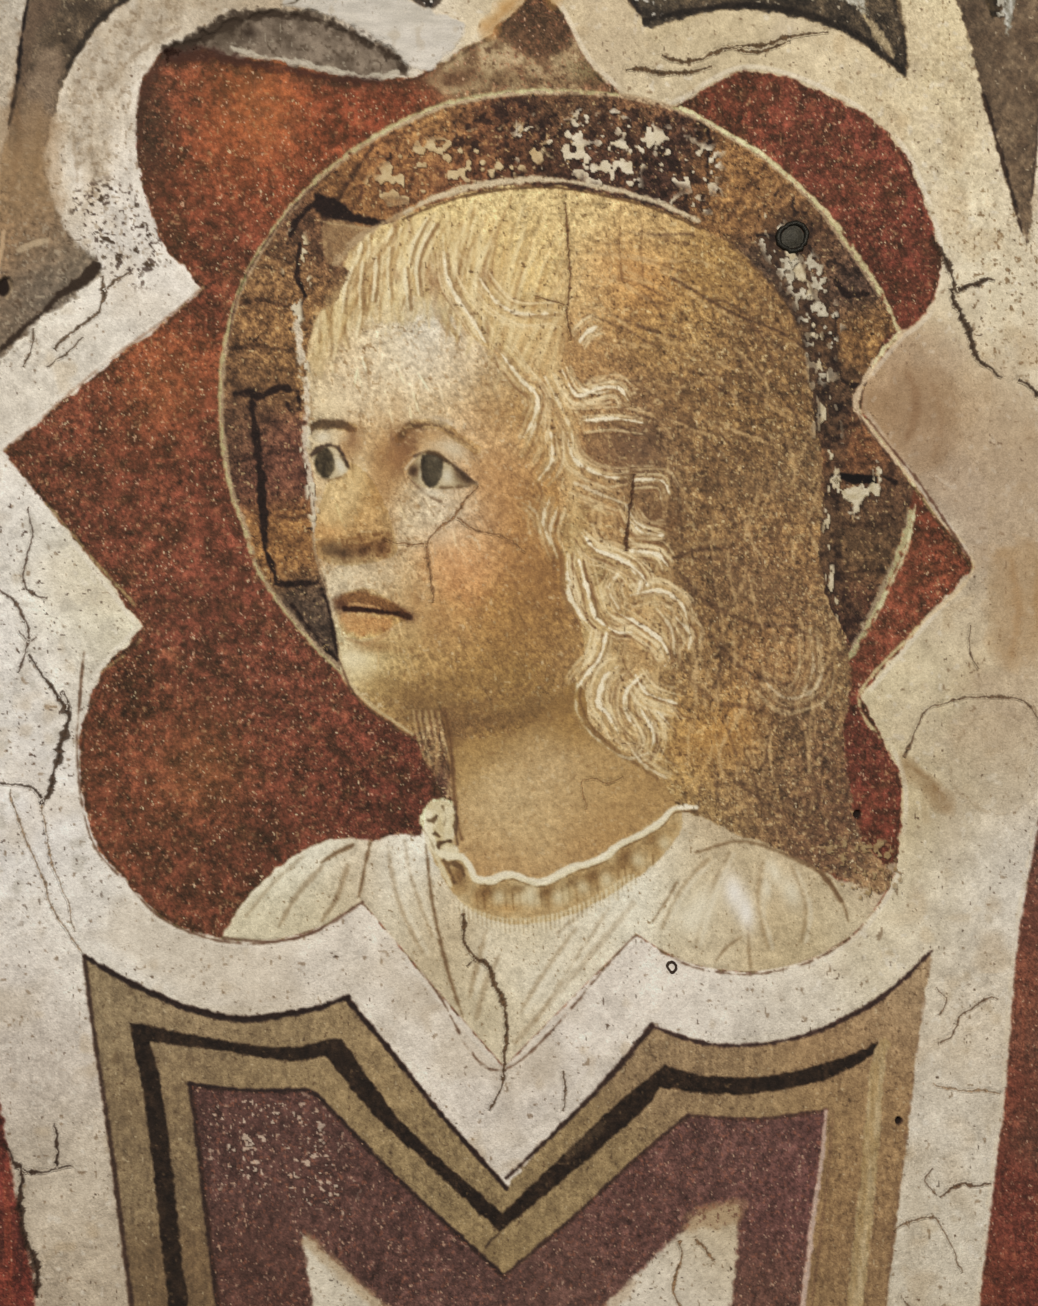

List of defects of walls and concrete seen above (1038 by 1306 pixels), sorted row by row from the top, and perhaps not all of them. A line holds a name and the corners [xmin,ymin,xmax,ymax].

flaking render [132,6,412,159]
crack [626,30,829,78]
peeling [362,108,729,217]
crack [929,236,1038,398]
peeling [753,196,883,623]
crack [385,484,527,602]
crack [0,506,83,954]
crack [460,913,510,1111]
crack [560,1070,568,1111]